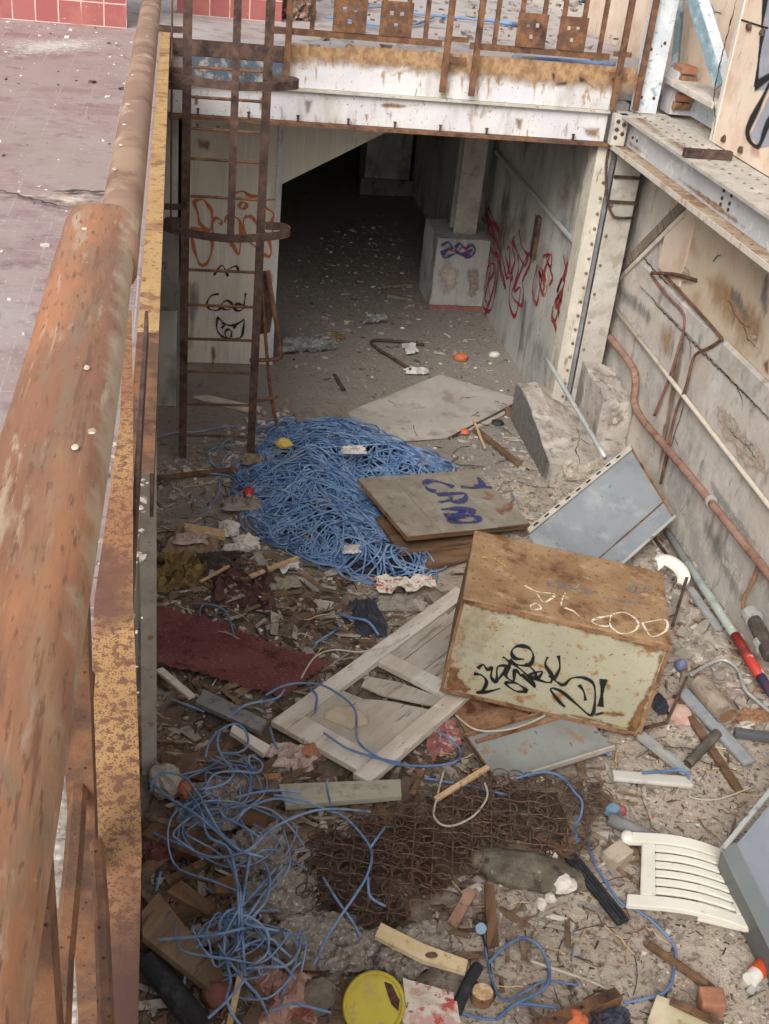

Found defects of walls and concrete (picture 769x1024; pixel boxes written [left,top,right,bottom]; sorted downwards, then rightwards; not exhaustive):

corrosion [284,44,638,95]
crack [0,189,105,208]